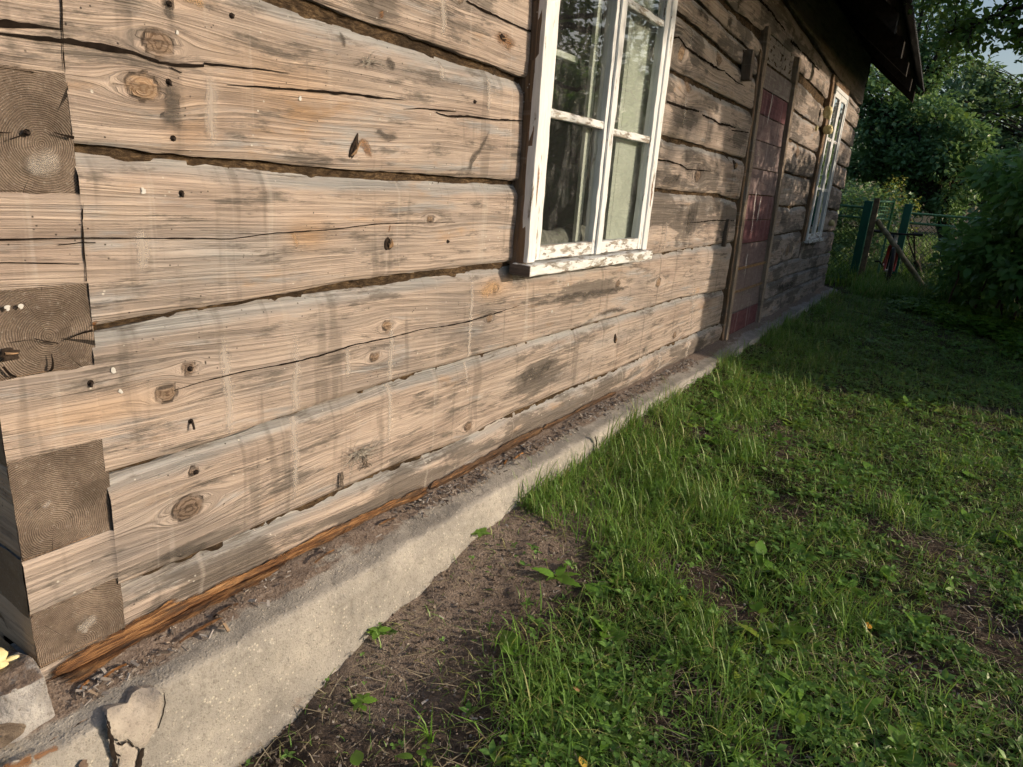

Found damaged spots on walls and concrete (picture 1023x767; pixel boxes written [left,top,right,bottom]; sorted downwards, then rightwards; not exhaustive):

crack [0,19,523,121]
crack [105,715,145,767]
peeling [102,685,164,767]
crack [158,692,166,728]